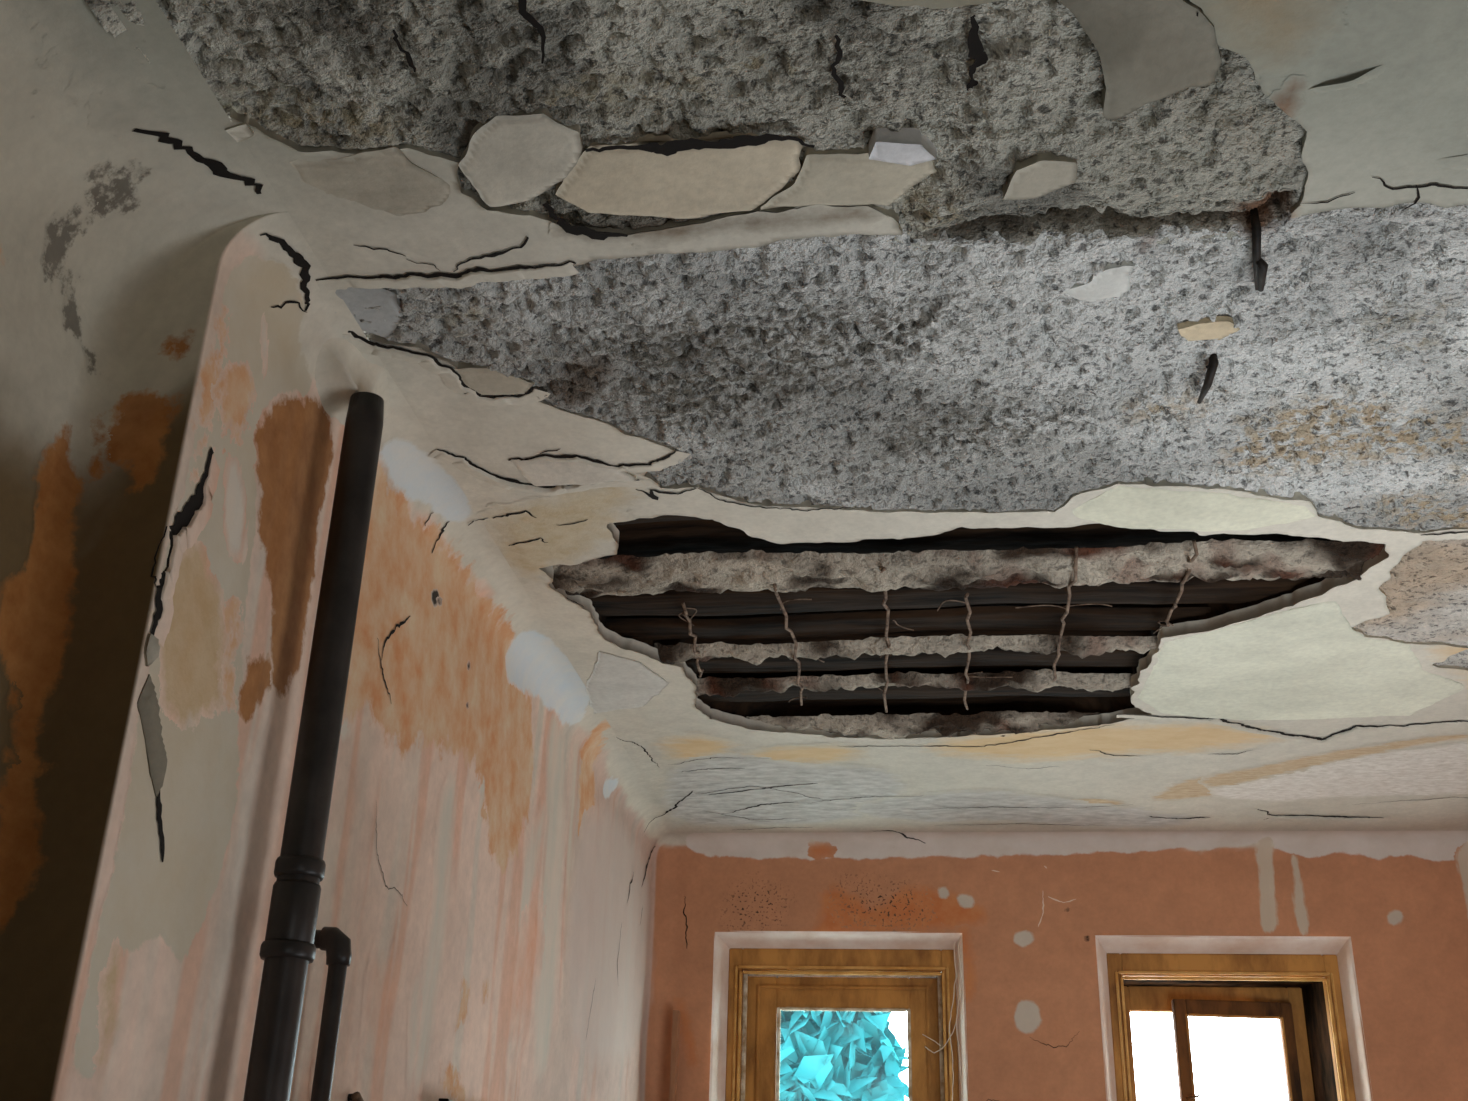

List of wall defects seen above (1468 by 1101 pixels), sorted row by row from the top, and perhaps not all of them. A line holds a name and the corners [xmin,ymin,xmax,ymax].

spalling [84,0,145,38]
crack [132,129,264,194]
peeling [34,158,153,376]
crack [260,203,628,312]
spalling [155,0,1468,739]
crack [150,447,220,647]
damp [210,360,335,700]
damp [477,473,650,585]
crack [425,449,861,553]
crack [840,714,1468,769]
damp [316,825,339,930]
damp [1254,837,1310,936]